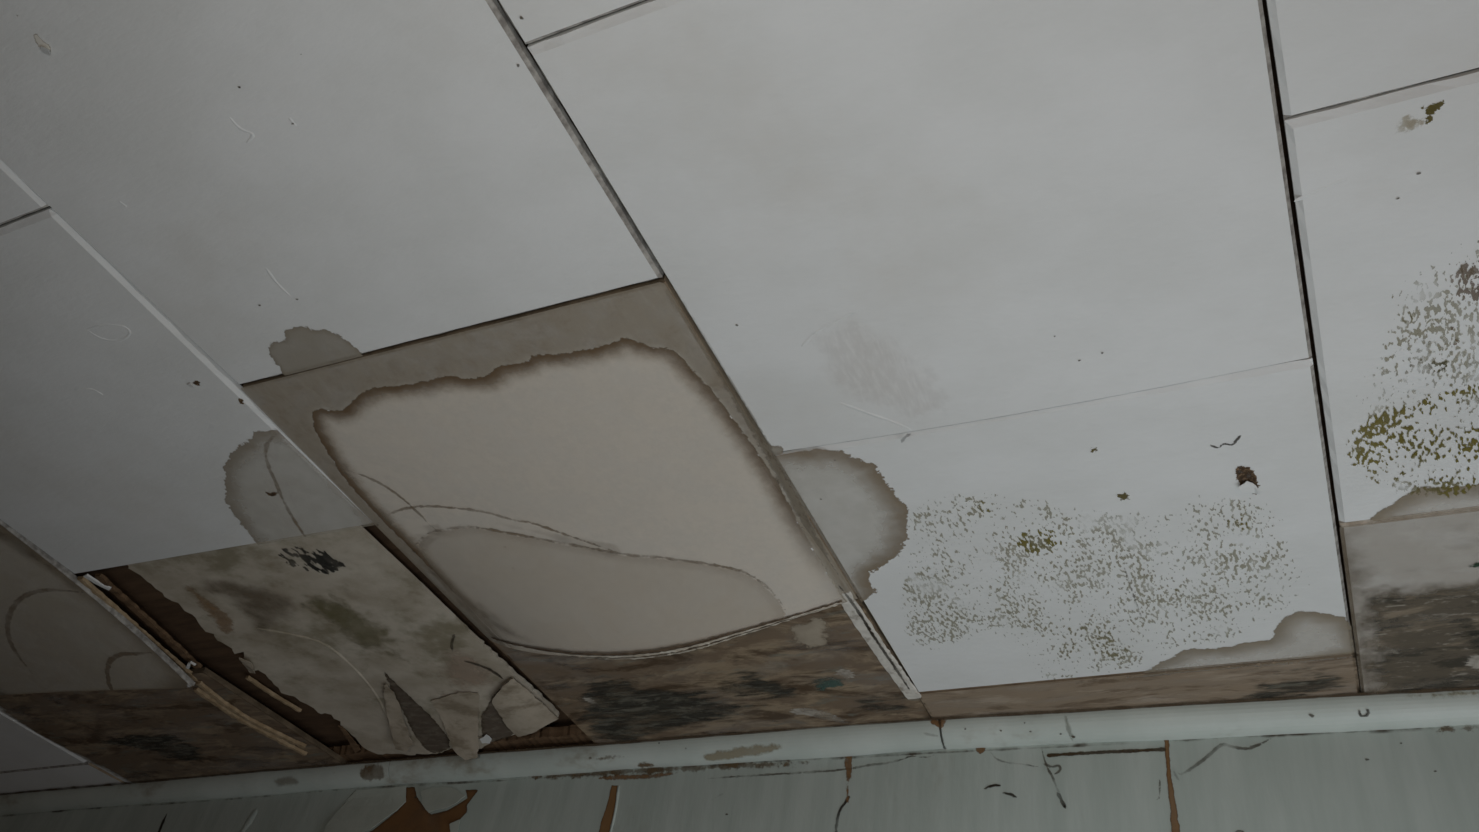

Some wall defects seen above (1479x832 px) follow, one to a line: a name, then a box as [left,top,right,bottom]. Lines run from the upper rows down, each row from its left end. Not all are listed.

damp [1451,261,1479,304]
damp [213,282,1479,760]
damp [0,525,341,783]
peeling [324,786,478,832]